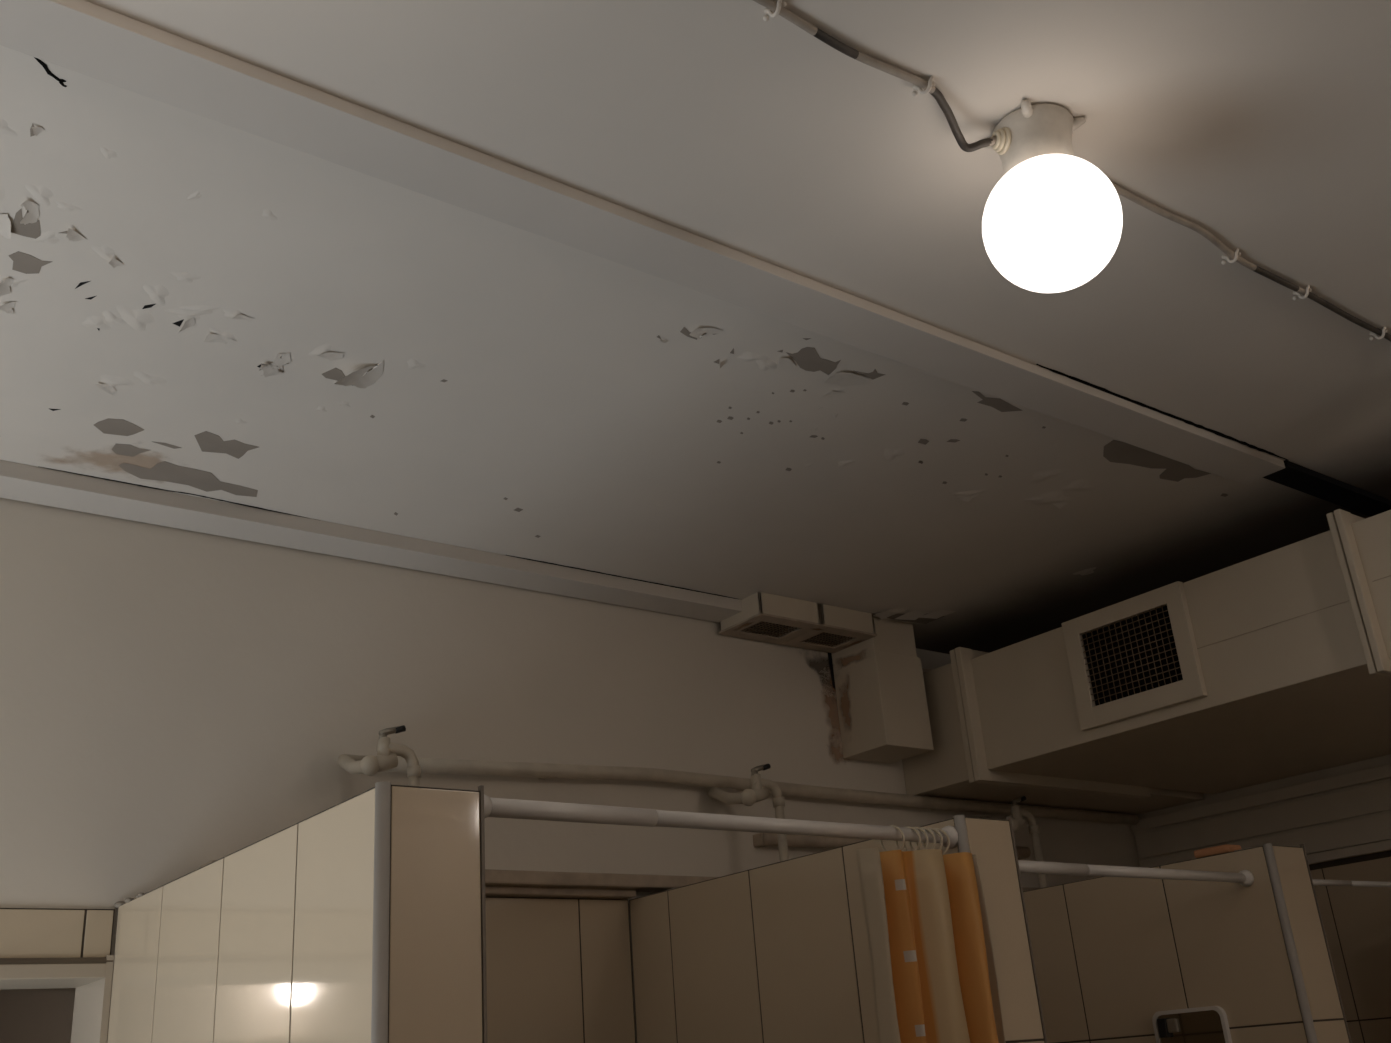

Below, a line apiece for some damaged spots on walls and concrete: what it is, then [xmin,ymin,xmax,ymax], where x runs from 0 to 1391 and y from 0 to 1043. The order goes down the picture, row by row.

peeling [0,183,124,314]
peeling [714,338,886,418]
peeling [972,391,1023,412]
peeling [94,418,259,497]
peeling [1103,440,1211,482]
damp [808,653,836,690]